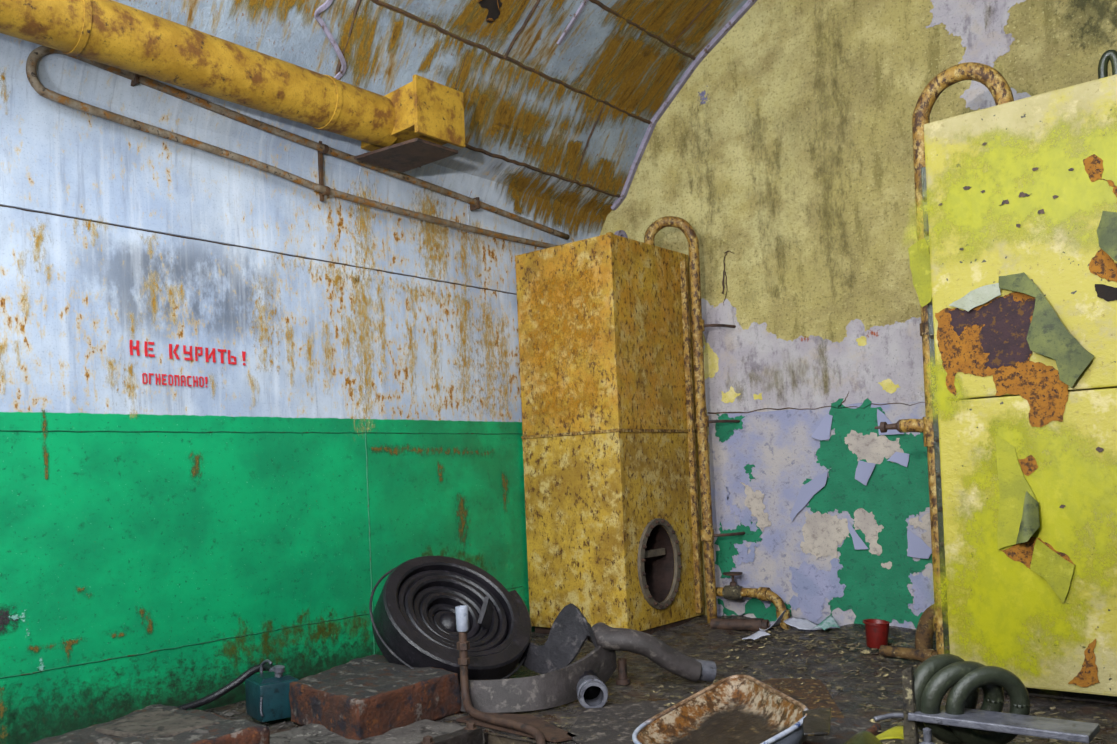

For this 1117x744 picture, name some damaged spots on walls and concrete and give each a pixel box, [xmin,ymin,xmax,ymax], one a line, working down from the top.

corrosion [230,0,319,23]
peeling [925,0,1026,68]
water stain [1069,0,1117,42]
peeling [960,80,996,110]
peeling [1011,88,1031,101]
corrosion [338,0,728,236]
corrosion [144,273,184,322]
corrosion [107,359,136,399]
peeling [701,298,934,629]
corrosion [29,639,81,658]